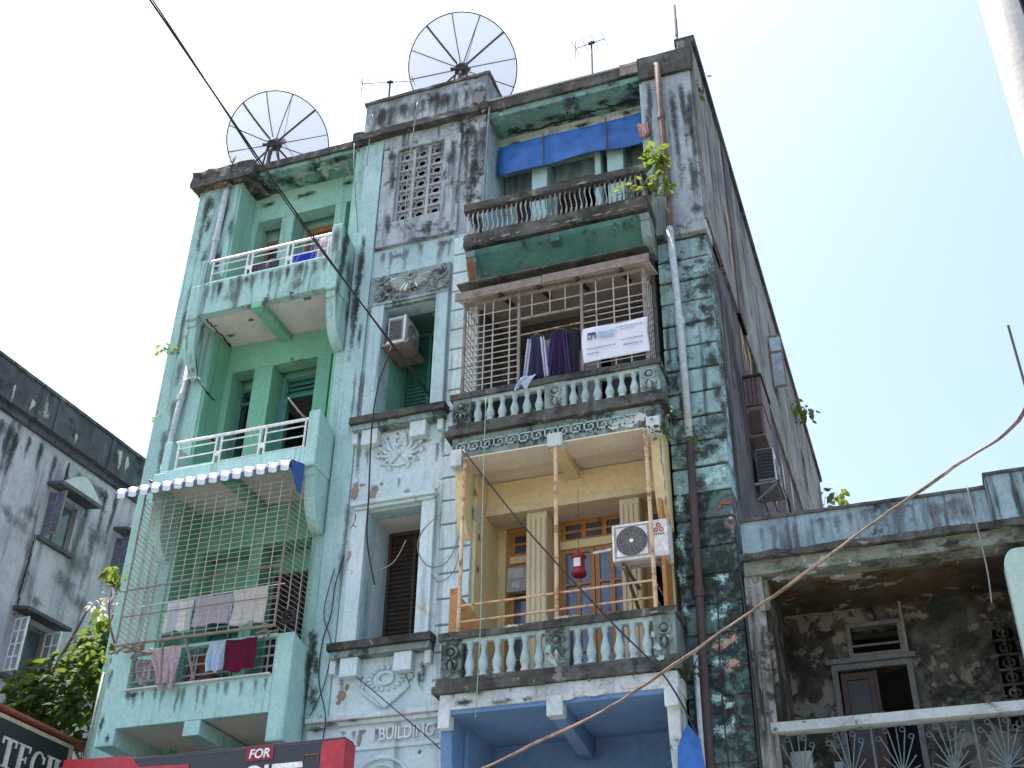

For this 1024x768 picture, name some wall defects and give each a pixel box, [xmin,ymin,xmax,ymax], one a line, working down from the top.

damp [376,86,486,128]
damp [579,99,633,115]
damp [438,126,487,202]
damp [653,86,771,336]
damp [197,198,365,345]
crack [206,319,231,347]
damp [0,420,81,486]
peeling [350,482,383,500]
damp [58,486,117,608]
peeling [797,612,834,634]